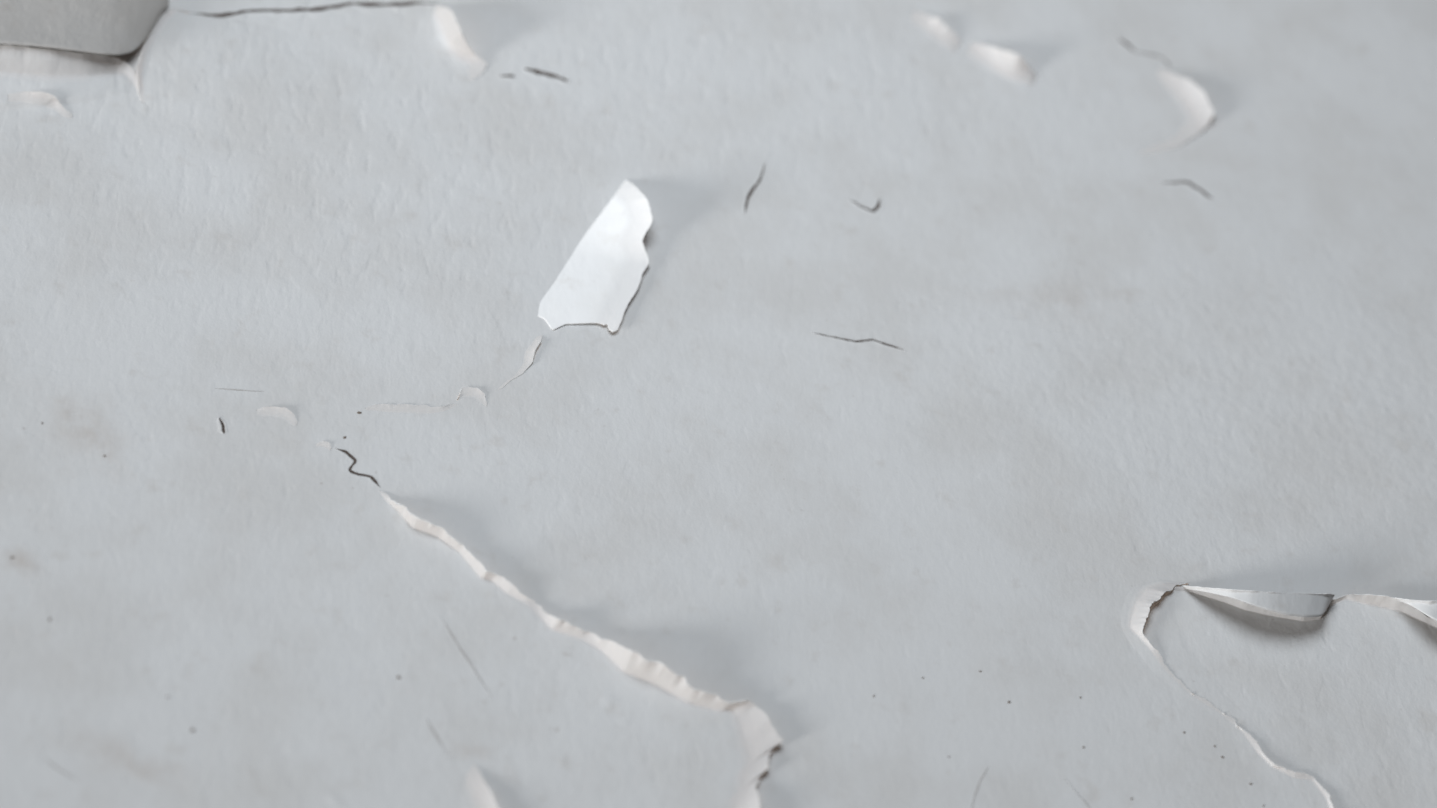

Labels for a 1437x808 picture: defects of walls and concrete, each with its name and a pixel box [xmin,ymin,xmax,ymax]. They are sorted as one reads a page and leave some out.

peeling [0,0,373,140]
crack [185,0,444,21]
peeling [433,6,487,80]
peeling [911,10,1037,91]
crack [1116,37,1171,69]
peeling [1141,68,1214,154]
peeling [457,180,653,407]
peeling [185,491,783,808]
flaking render [1121,579,1437,808]